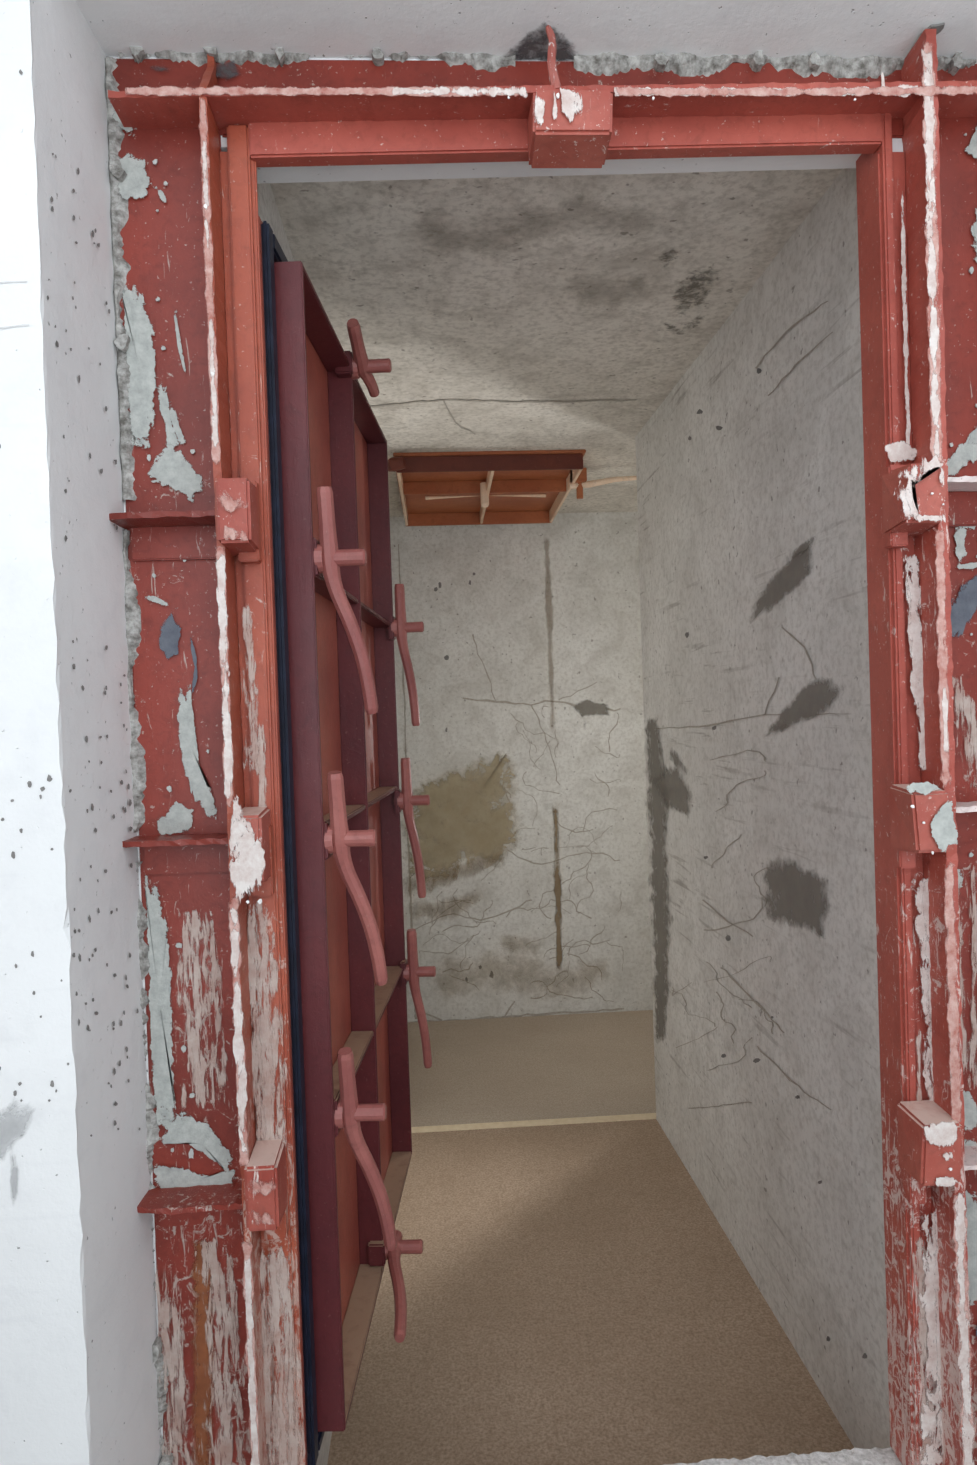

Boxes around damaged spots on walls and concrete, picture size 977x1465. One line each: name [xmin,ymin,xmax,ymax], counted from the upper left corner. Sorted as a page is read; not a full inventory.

peeling [61,546,265,1188]
crack [407,634,624,1023]
leakage [645,720,689,1039]
crack [655,677,781,868]
crack [672,867,774,1070]
leakage [754,538,813,619]
leakage [764,862,827,935]
leakage [767,627,838,735]
peeling [912,878,934,1101]
peeling [902,554,974,888]
crack [689,1101,752,1109]
peeling [242,1242,260,1465]